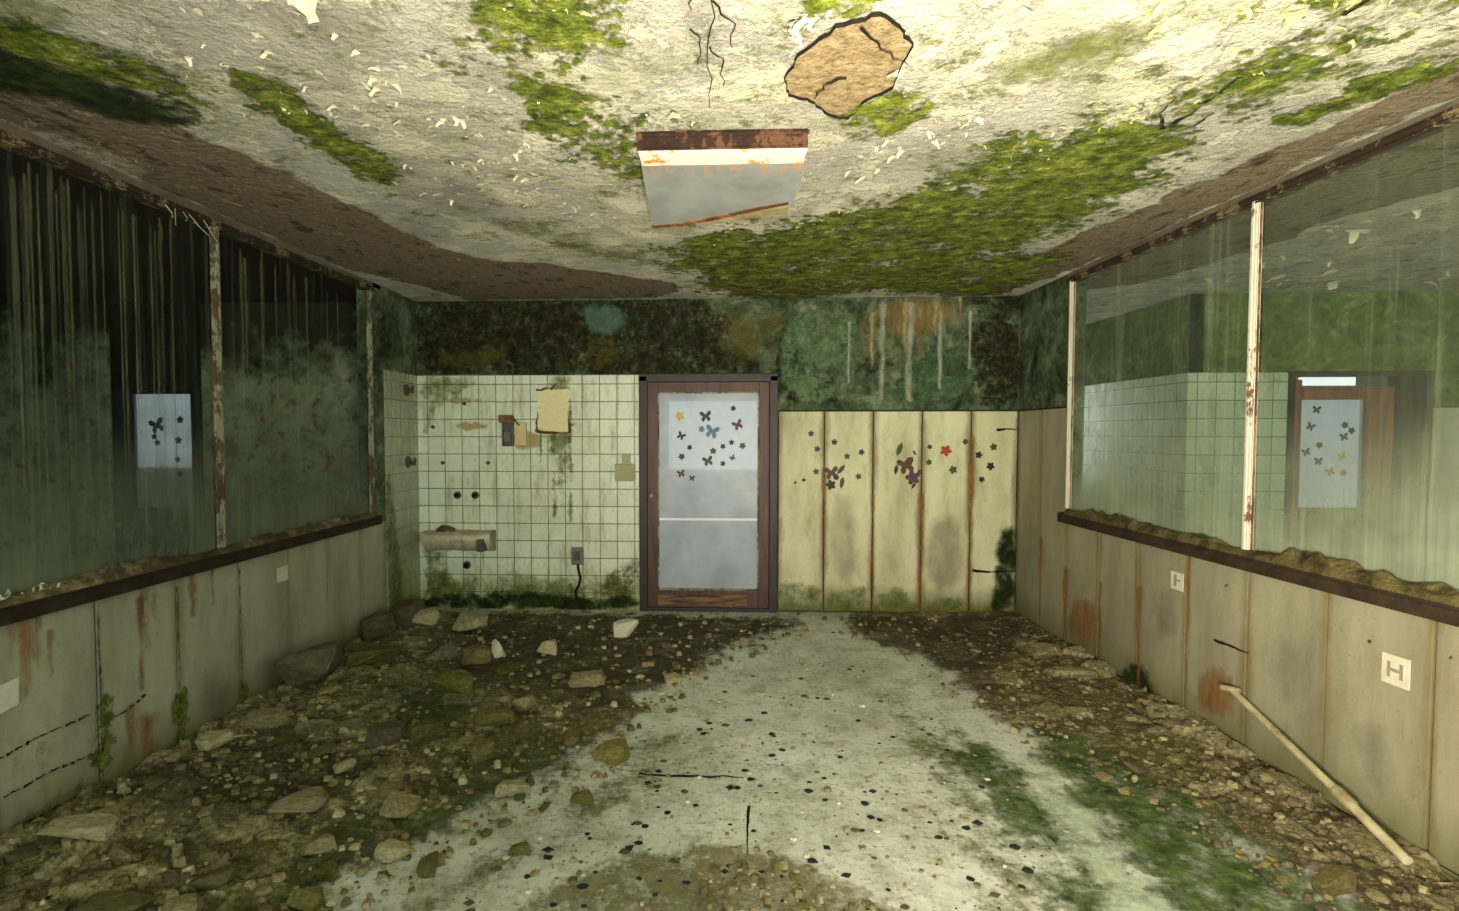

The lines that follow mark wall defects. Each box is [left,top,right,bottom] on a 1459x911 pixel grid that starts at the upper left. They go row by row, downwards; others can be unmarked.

peeling [262,0,339,41]
peeling [184,43,239,93]
peeling [251,31,275,70]
peeling [280,49,327,130]
crack [688,0,736,108]
flaking render [784,0,926,120]
leakage [11,118,150,177]
peeling [327,49,643,239]
rust [1201,672,1231,713]